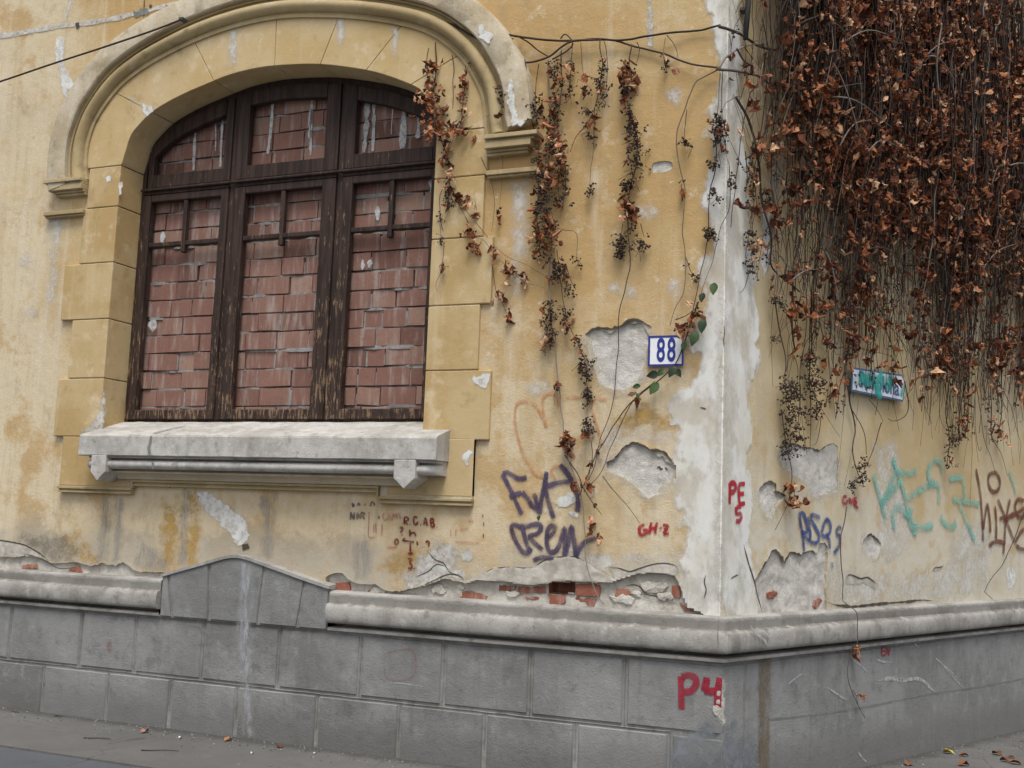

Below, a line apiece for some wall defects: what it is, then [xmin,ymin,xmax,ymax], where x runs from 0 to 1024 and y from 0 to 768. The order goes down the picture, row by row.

flaking render [652,161,673,173]
flaking render [583,318,655,395]
damp [21,500,122,561]
flaking render [0,539,164,578]
peeling [197,491,250,550]
flaking render [328,541,701,614]
flaking render [604,442,676,498]
flaking render [759,481,786,519]
flaking render [779,443,840,500]
flaking render [755,543,931,613]
flaking render [861,533,881,561]